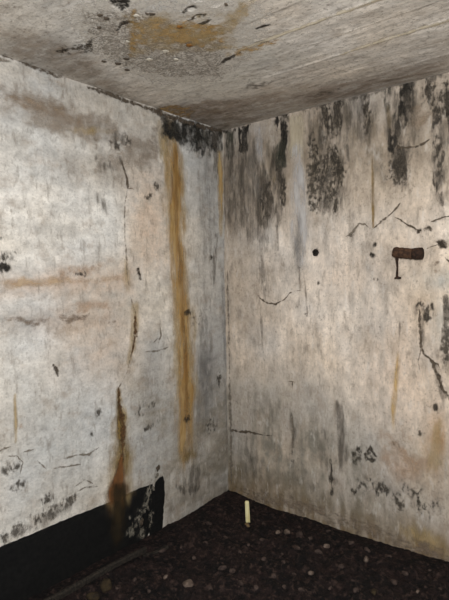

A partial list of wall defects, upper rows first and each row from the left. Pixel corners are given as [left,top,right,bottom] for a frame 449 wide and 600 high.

damp [162,100,351,246]
damp [353,94,371,134]
crack [346,203,419,237]
damp [375,74,449,204]
rust [161,136,194,458]
crack [416,302,449,396]
mould [35,493,76,525]
rust [108,387,129,539]
mould [351,478,404,510]